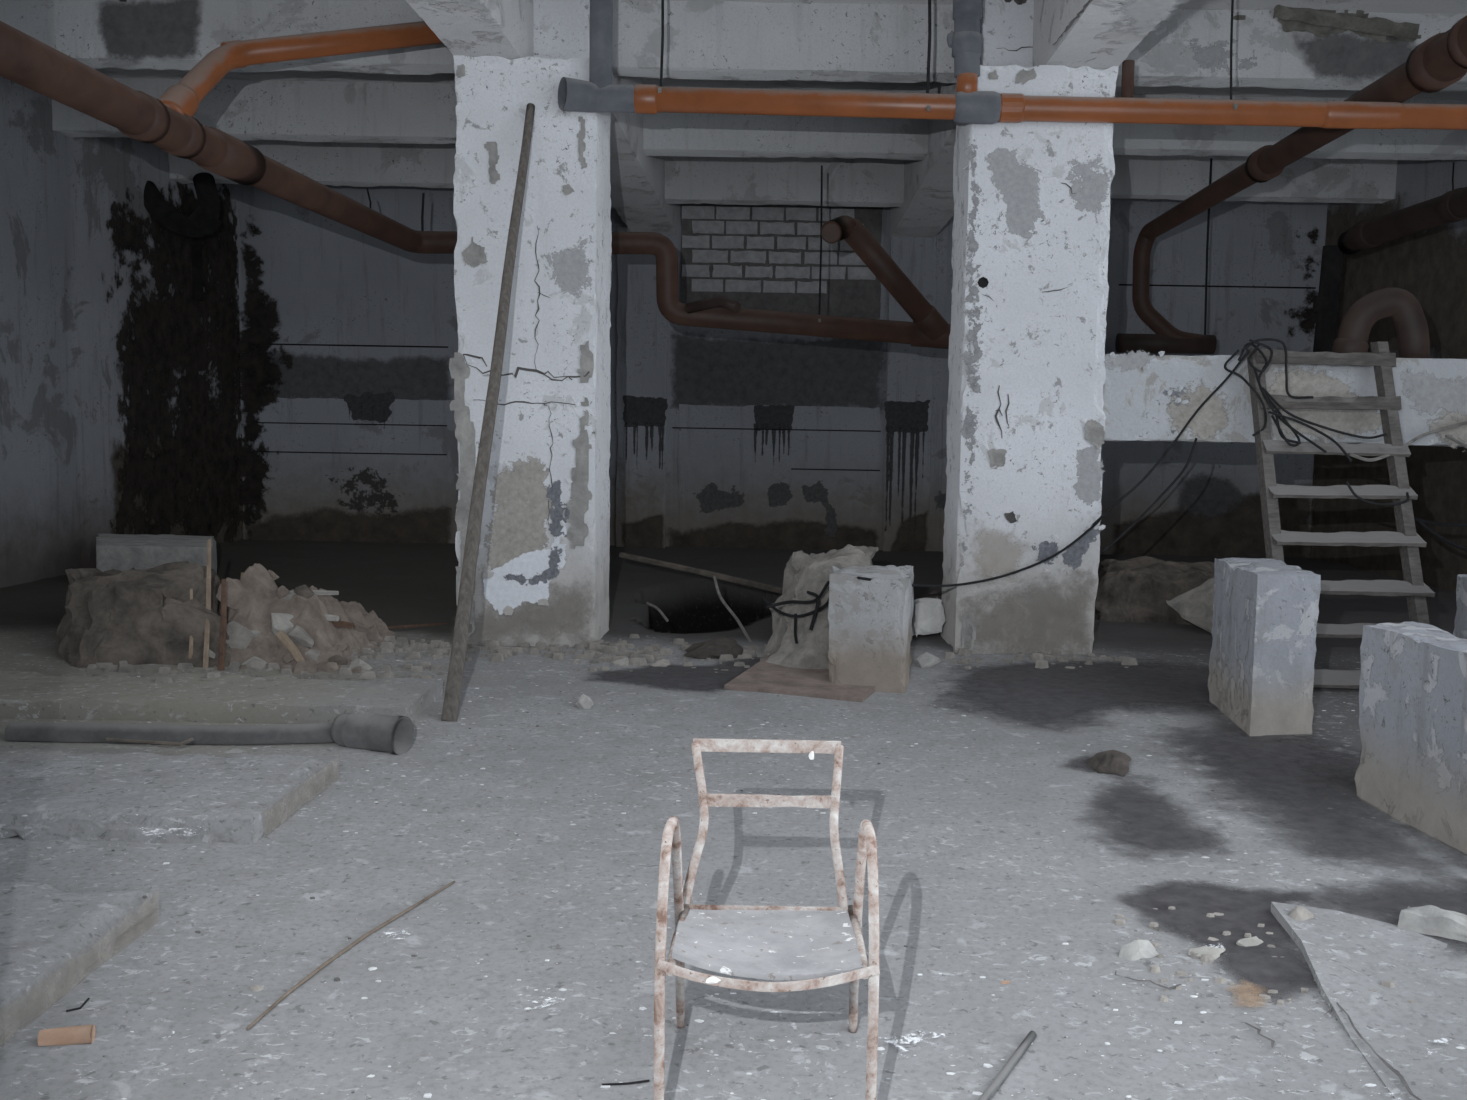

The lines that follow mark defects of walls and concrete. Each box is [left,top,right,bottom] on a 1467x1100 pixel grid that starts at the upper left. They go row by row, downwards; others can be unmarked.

crack [997,0,1092,51]
damp [1299,33,1416,79]
peeling [1065,154,1111,223]
damp [102,182,450,544]
crack [463,226,590,525]
damp [672,334,885,462]
peeling [449,341,594,637]
damp [622,422,927,552]
crack [1324,1002,1421,1100]